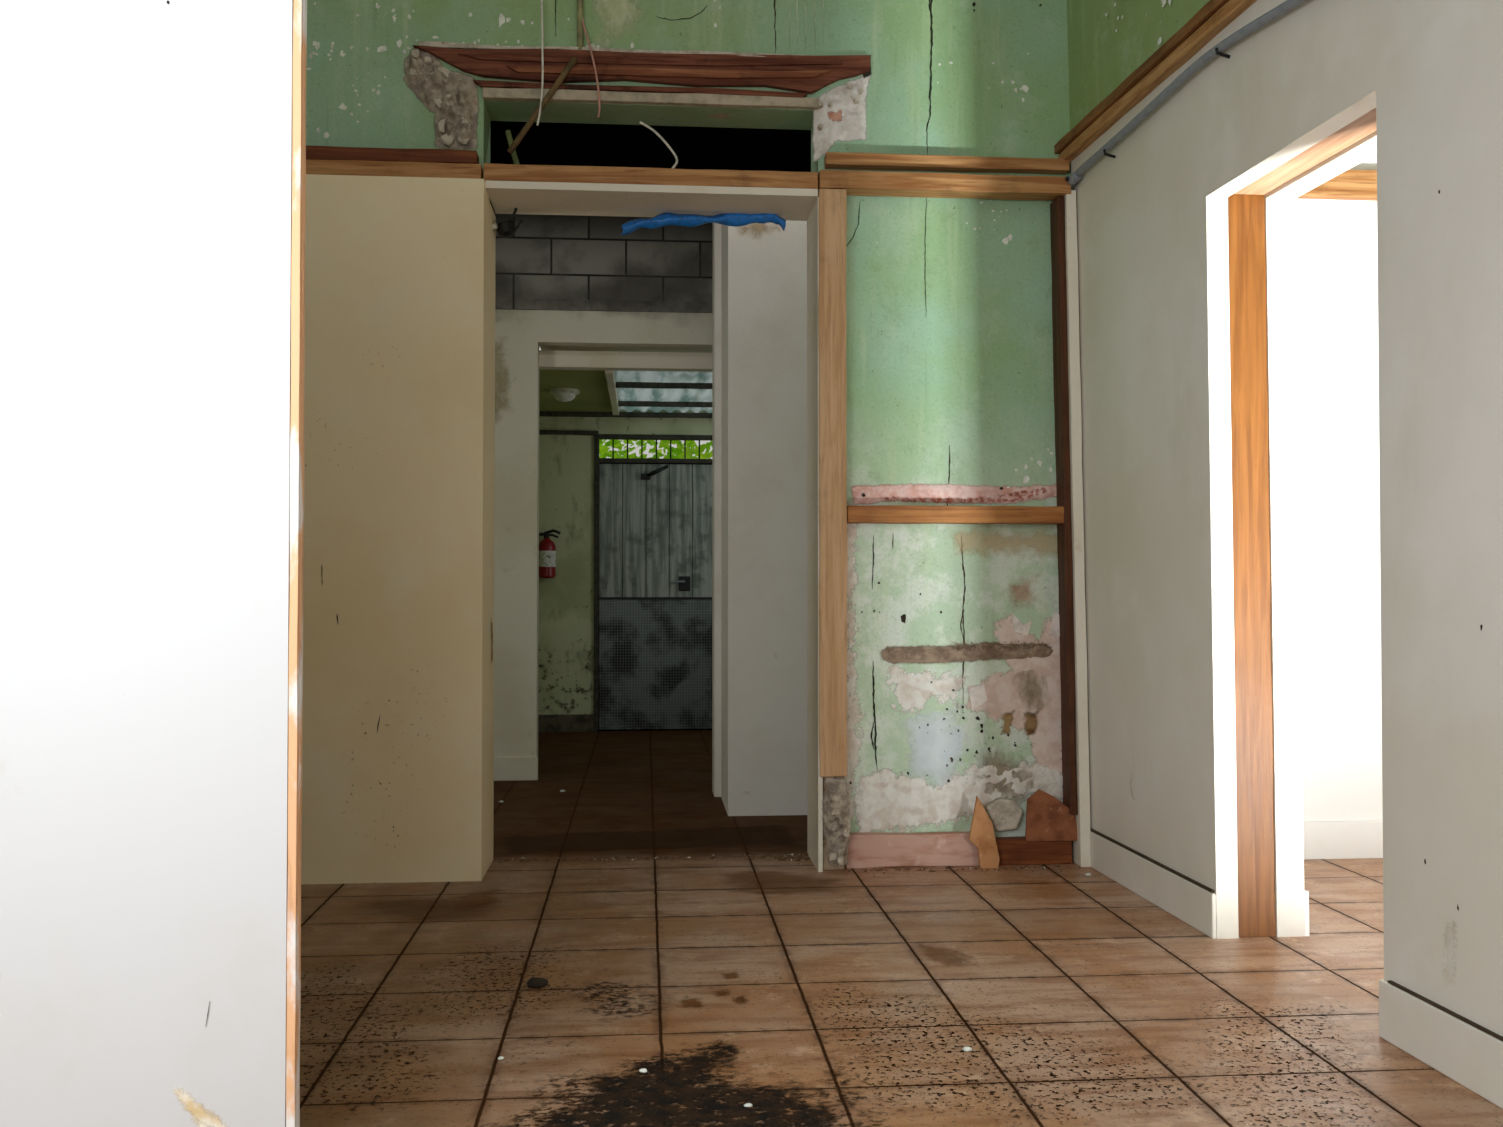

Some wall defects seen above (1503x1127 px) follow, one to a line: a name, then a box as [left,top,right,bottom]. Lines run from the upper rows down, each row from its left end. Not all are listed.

spalling [307,3,479,150]
peeling [463,13,534,46]
spalling [812,55,871,161]
spalling [847,448,1056,506]
peeling [822,524,1063,870]